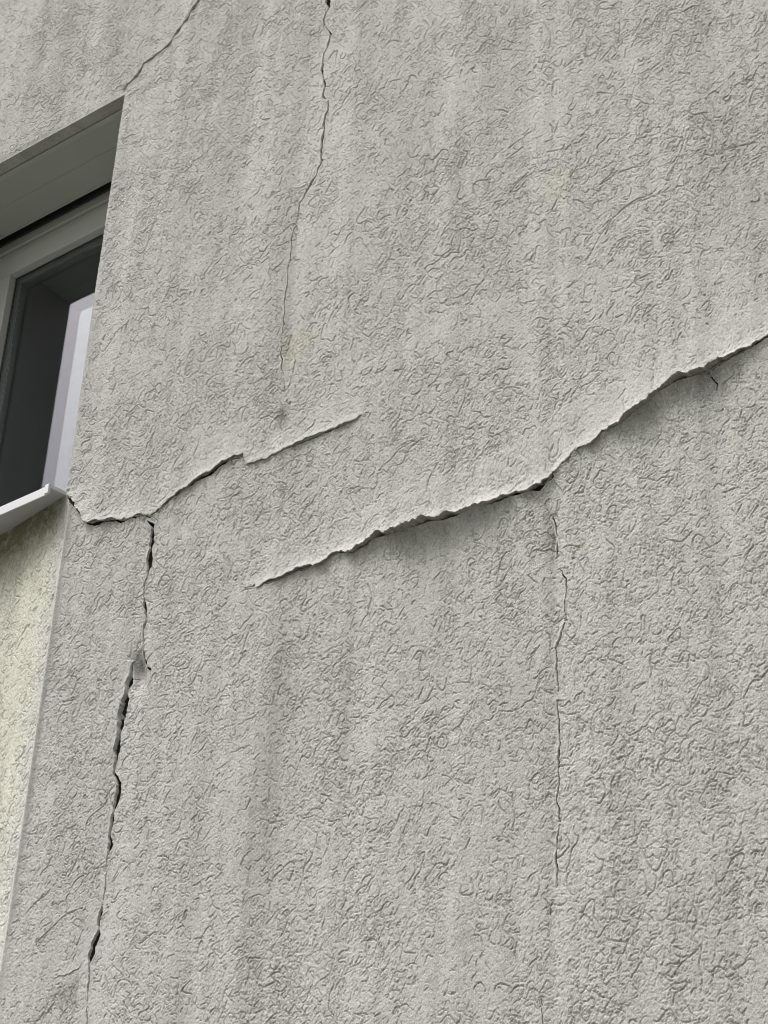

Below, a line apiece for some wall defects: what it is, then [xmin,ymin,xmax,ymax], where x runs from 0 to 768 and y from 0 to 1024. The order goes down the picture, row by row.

crack [123,0,200,93]
crack [279,0,333,395]
crack [72,514,156,1024]
crack [548,500,570,933]